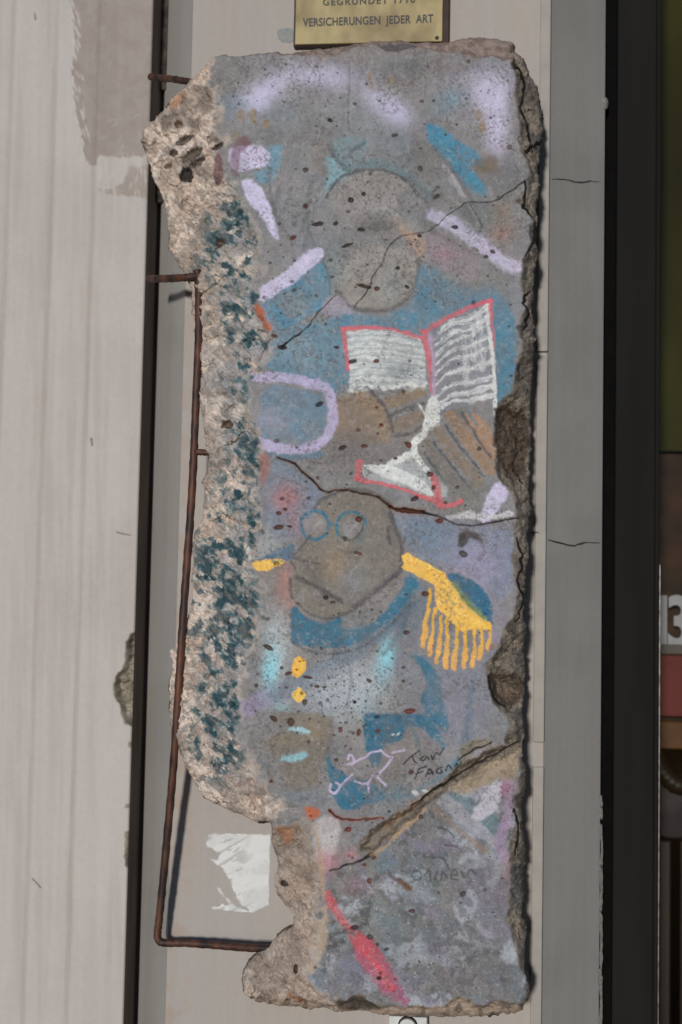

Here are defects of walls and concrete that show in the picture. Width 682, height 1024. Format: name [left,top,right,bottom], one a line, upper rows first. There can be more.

crack [552,177,599,185]
crack [530,532,600,547]